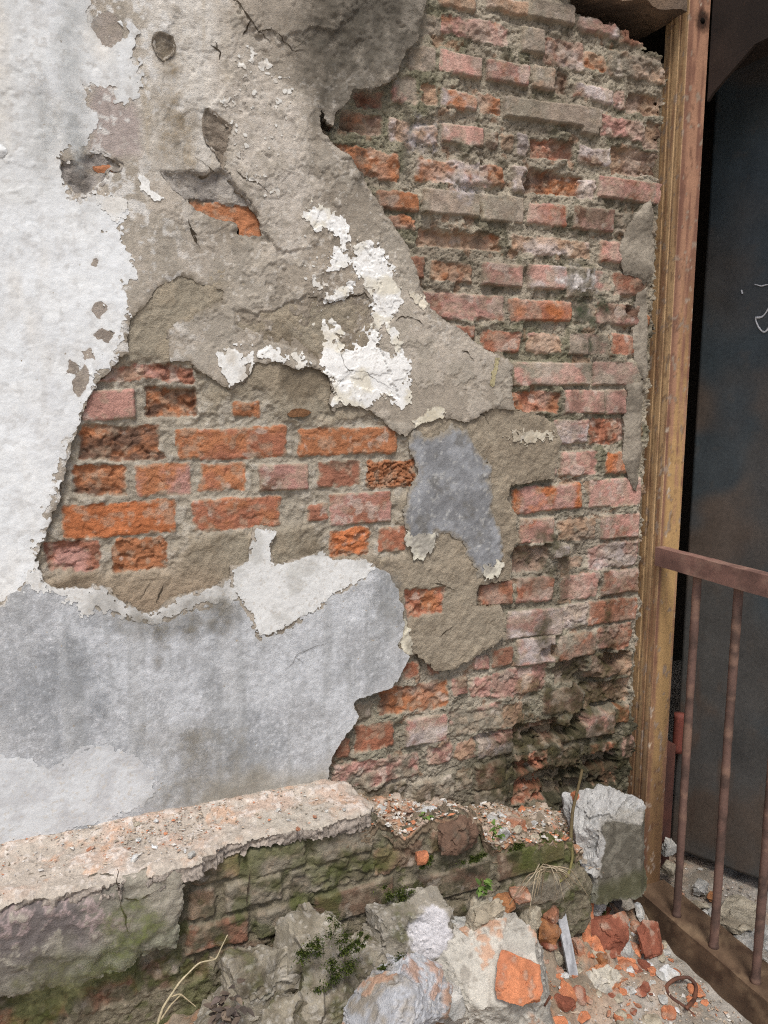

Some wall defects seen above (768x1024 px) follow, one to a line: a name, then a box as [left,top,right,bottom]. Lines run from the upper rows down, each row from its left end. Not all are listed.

flaking render [0,0,668,843]
crack [116,869,159,934]